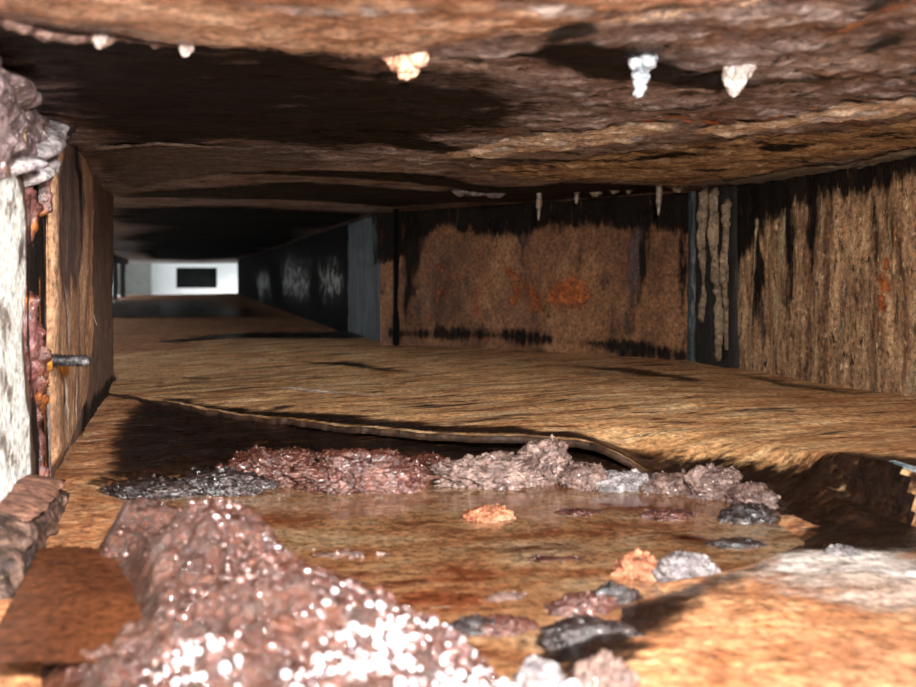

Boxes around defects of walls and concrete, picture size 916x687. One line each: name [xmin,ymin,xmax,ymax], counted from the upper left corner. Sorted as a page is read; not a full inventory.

leakage [0,19,726,163]
leakage [744,74,877,88]
leakage [59,143,85,354]
leakage [112,156,916,395]
corrosion [23,279,77,477]
leakage [81,374,116,436]
leakage [89,398,916,682]